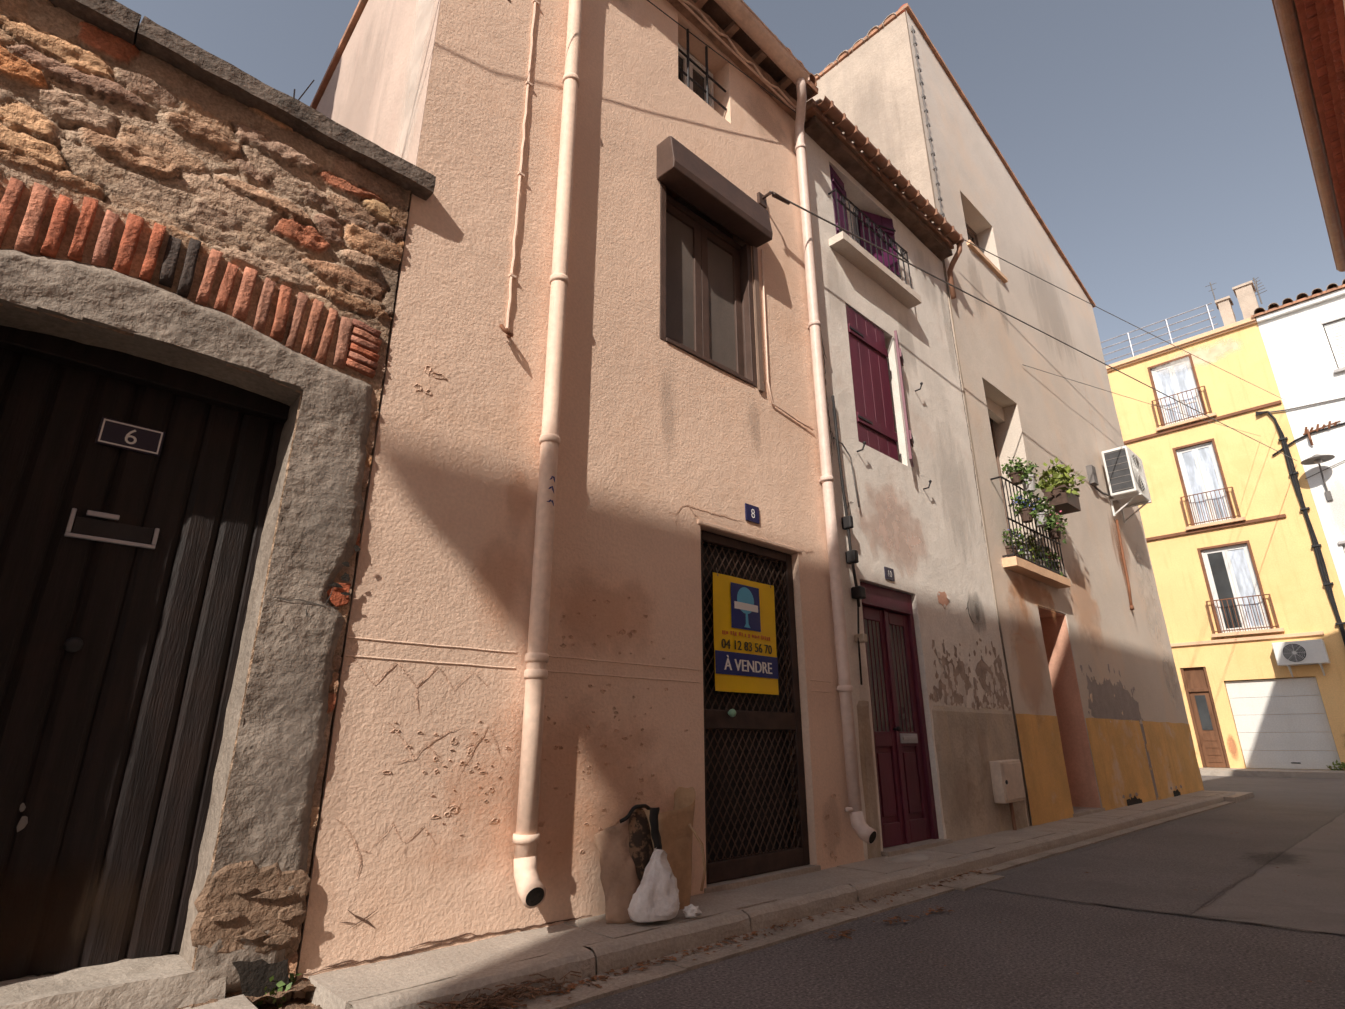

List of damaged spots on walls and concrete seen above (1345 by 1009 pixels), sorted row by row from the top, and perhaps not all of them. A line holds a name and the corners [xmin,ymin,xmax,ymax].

peeling [929,638,1011,711]
peeling [1080,664,1192,806]